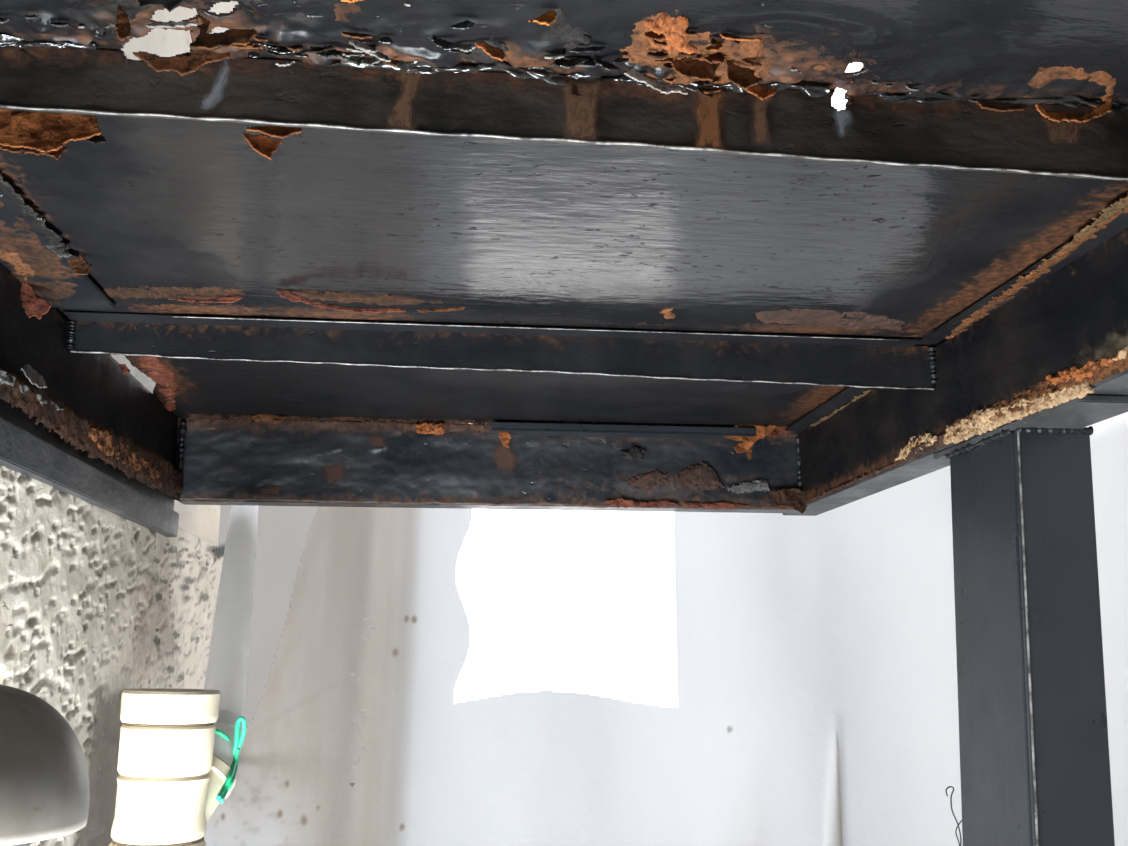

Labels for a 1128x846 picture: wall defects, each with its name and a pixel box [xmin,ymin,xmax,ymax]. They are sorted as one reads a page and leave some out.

peeling [115,0,186,41]
rust [0,109,107,160]
rust [242,125,302,159]
rust [619,10,776,147]
rust [977,66,1117,145]
rust [0,200,92,319]
rust [0,367,184,498]
rust [768,335,1128,514]
rust [604,498,751,510]